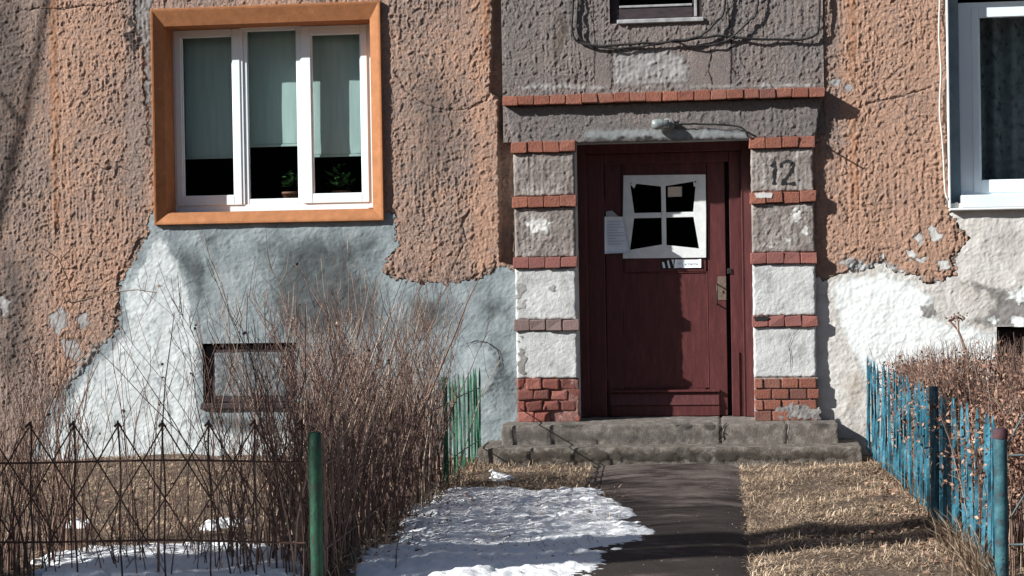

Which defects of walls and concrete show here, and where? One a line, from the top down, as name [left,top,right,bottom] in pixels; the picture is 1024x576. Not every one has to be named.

peeling [0,296,11,316]
peeling [32,212,527,460]
peeling [775,202,1024,455]